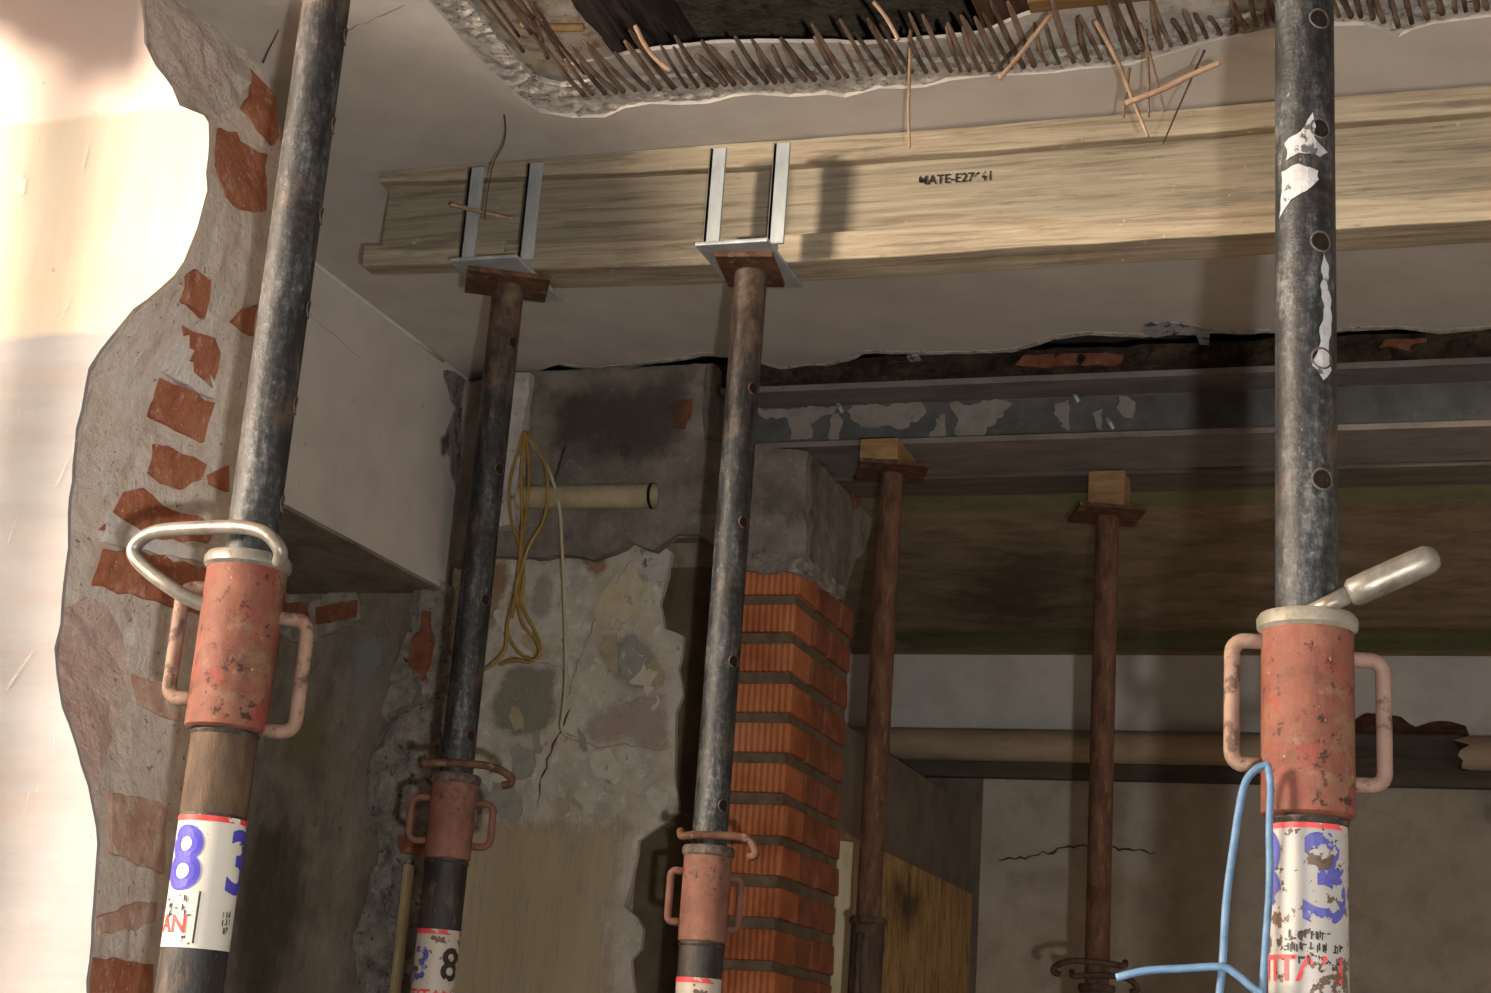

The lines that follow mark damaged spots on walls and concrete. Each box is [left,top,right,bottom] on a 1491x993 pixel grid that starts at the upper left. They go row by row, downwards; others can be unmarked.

spalling [1334,0,1491,36]
spalling [432,0,1275,117]
spalling [143,0,280,213]
spalling [230,304,258,336]
spalling [759,321,1275,387]
spalling [1337,325,1491,363]
peeling [758,397,1071,441]
spalling [57,269,230,874]
peeling [638,548,671,582]
flaking render [352,579,455,993]
spalling [95,901,157,936]
spalling [89,957,154,993]